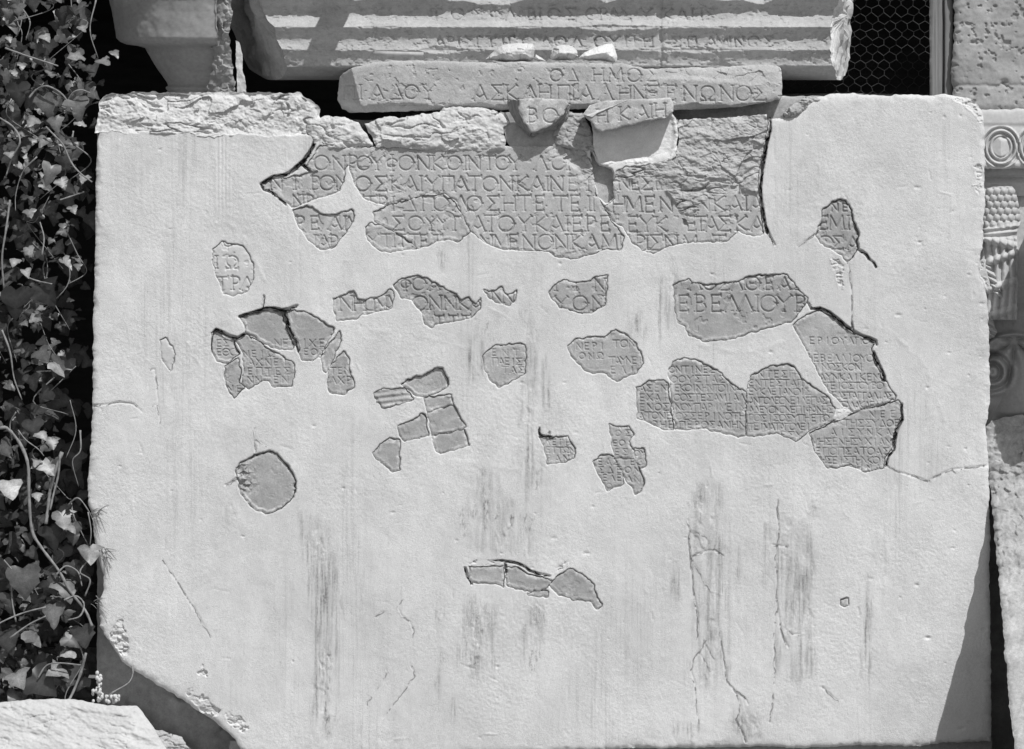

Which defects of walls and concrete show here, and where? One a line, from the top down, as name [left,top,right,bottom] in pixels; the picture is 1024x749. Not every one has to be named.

crack [759,117,774,245]
crack [886,404,985,482]
crack [688,526,747,742]